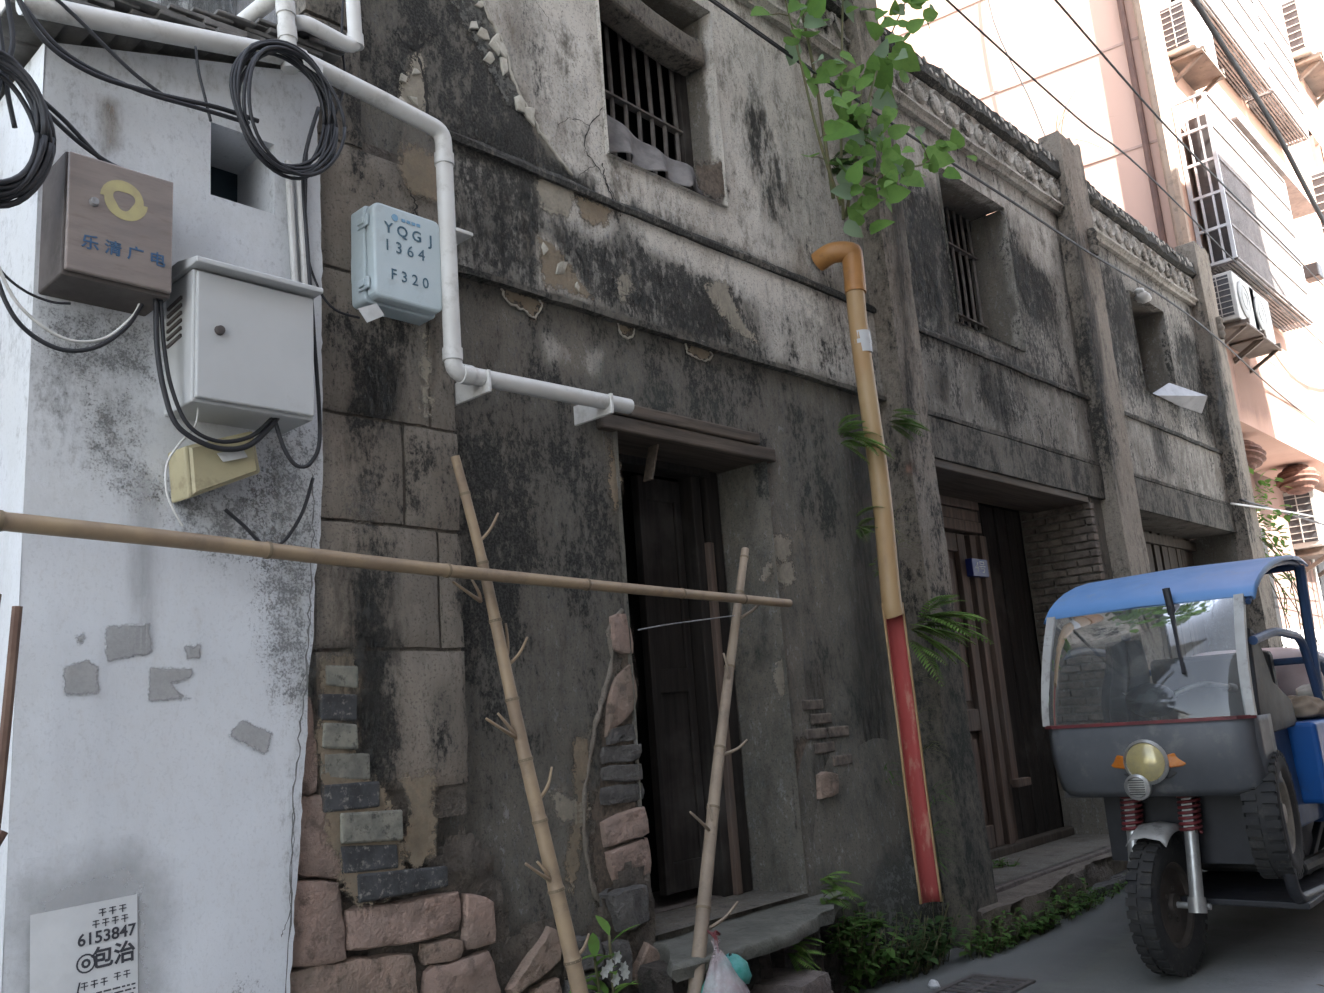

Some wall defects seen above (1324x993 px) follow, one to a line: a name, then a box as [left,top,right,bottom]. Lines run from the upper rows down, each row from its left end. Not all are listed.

flaking render [398,48,430,113]
flaking render [397,142,437,202]
flaking render [450,0,613,227]
water stain [693,159,730,201]
water stain [457,183,731,343]
flaking render [704,279,758,344]
water stain [893,191,1077,423]
water stain [1075,234,1142,490]
water stain [38,308,319,708]
peeling [63,624,201,701]
peeling [231,721,271,753]
flaking render [314,643,448,907]